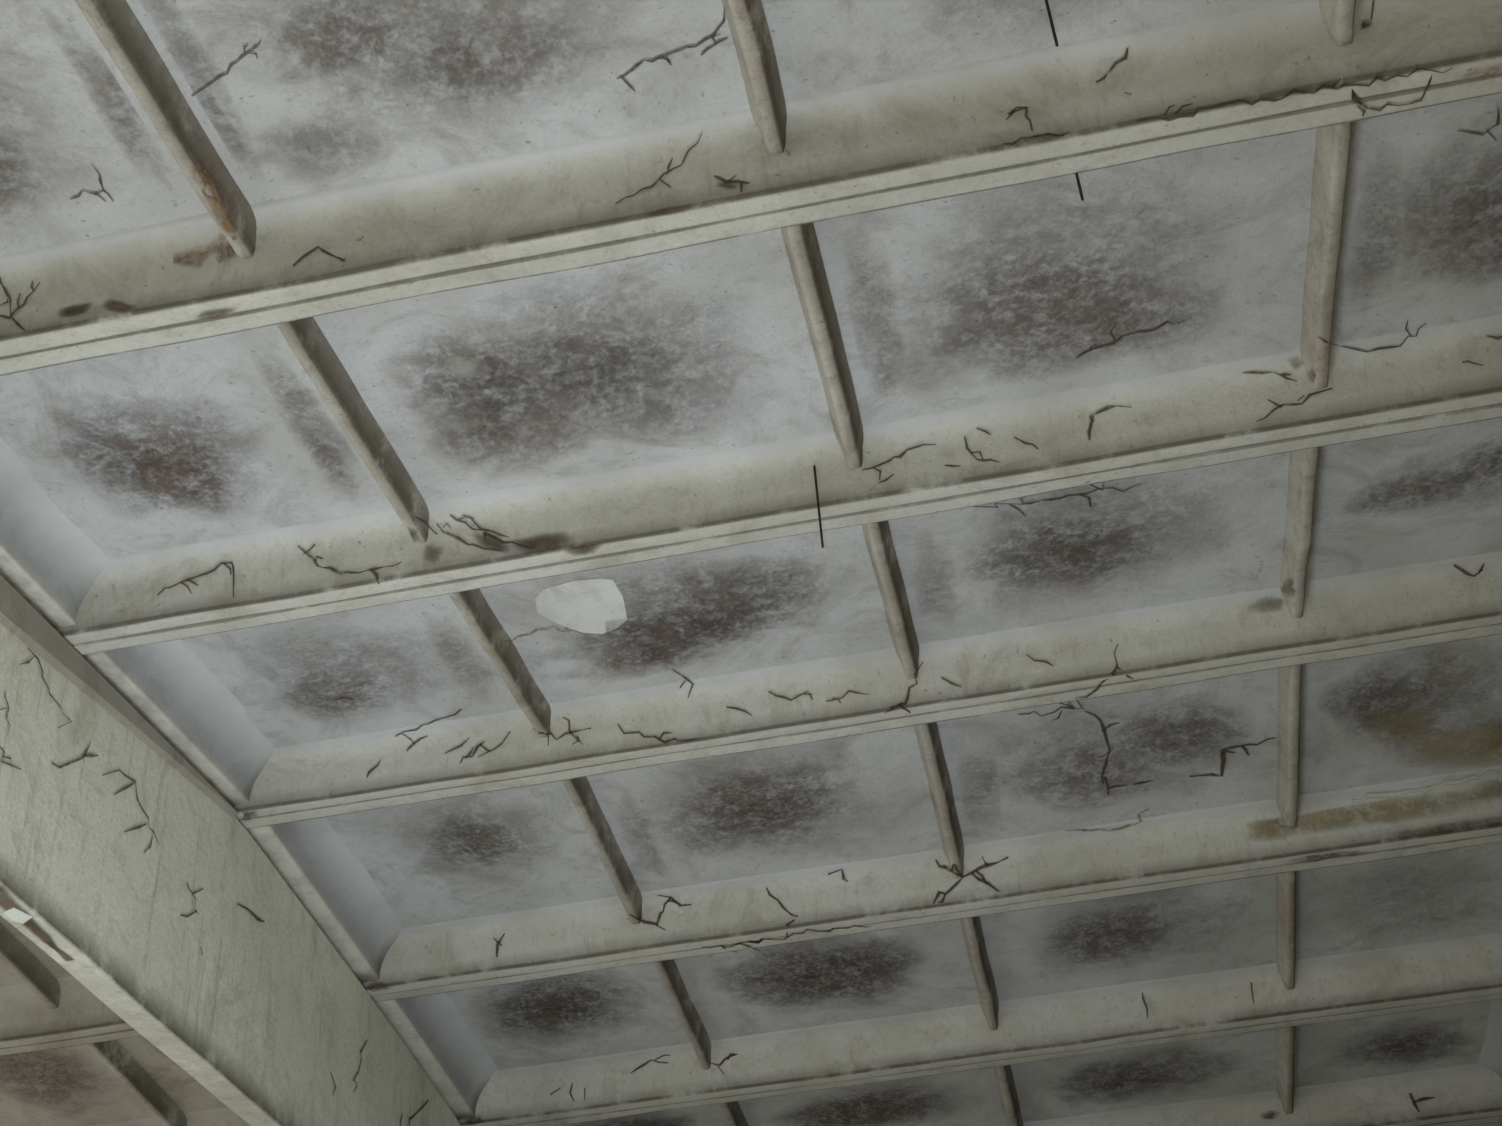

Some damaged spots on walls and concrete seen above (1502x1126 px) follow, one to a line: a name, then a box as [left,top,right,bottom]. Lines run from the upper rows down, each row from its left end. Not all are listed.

crack [617,8,728,92]
crack [0,278,40,331]
damp [111,433,200,483]
crack [157,562,235,597]
peeling [535,578,629,634]
crack [672,669,694,698]
crack [726,662,962,716]
crack [367,709,699,778]
crack [1018,644,1153,831]
crack [1190,737,1277,777]
crack [933,856,1008,904]
spalling [0,888,73,961]